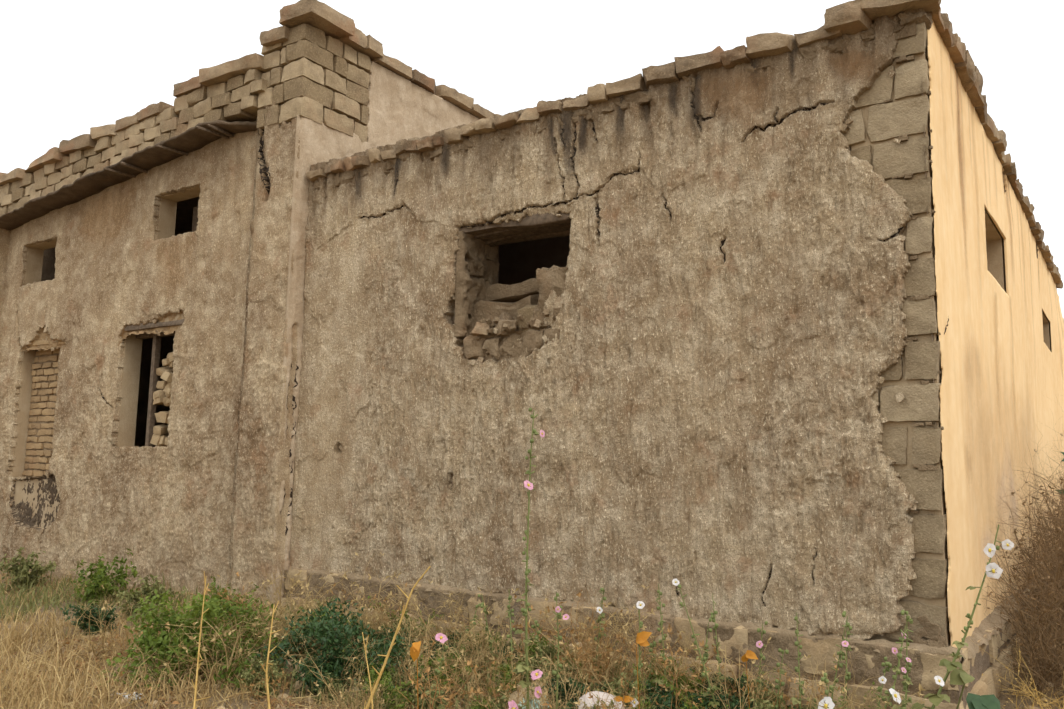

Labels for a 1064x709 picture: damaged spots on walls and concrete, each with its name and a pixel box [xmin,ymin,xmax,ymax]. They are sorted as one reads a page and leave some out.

crack [744,103,829,142]
crack [361,179,409,219]
crack [459,123,641,236]
spalling [118,307,184,346]
spalling [461,319,552,366]
spalling [843,22,949,648]
spalling [9,470,60,534]